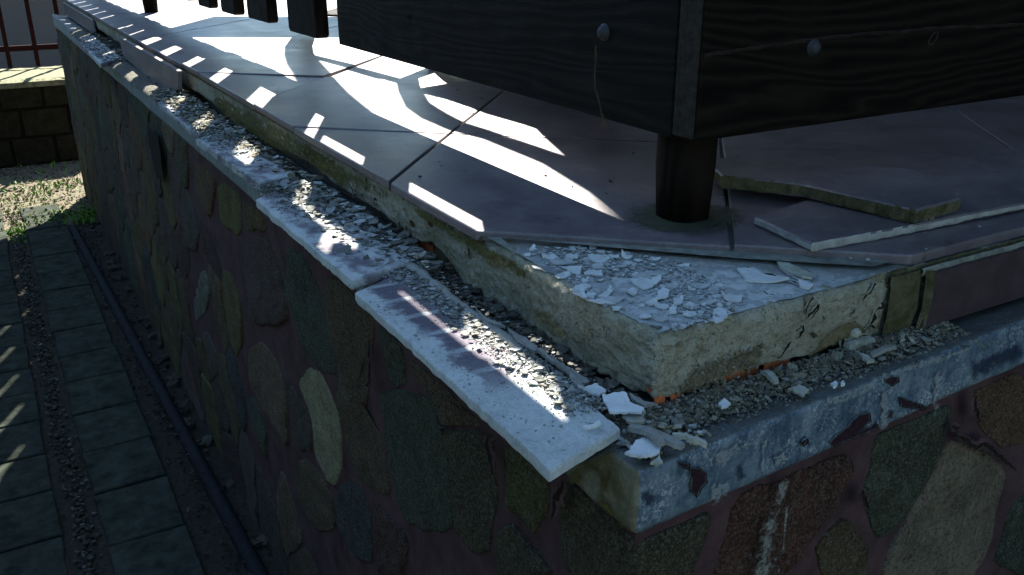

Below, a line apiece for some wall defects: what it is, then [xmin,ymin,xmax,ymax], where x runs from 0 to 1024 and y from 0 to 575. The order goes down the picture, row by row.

peeling [524,244,742,331]
crack [745,266,889,358]
peeling [829,375,927,448]
peeling [678,461,708,497]